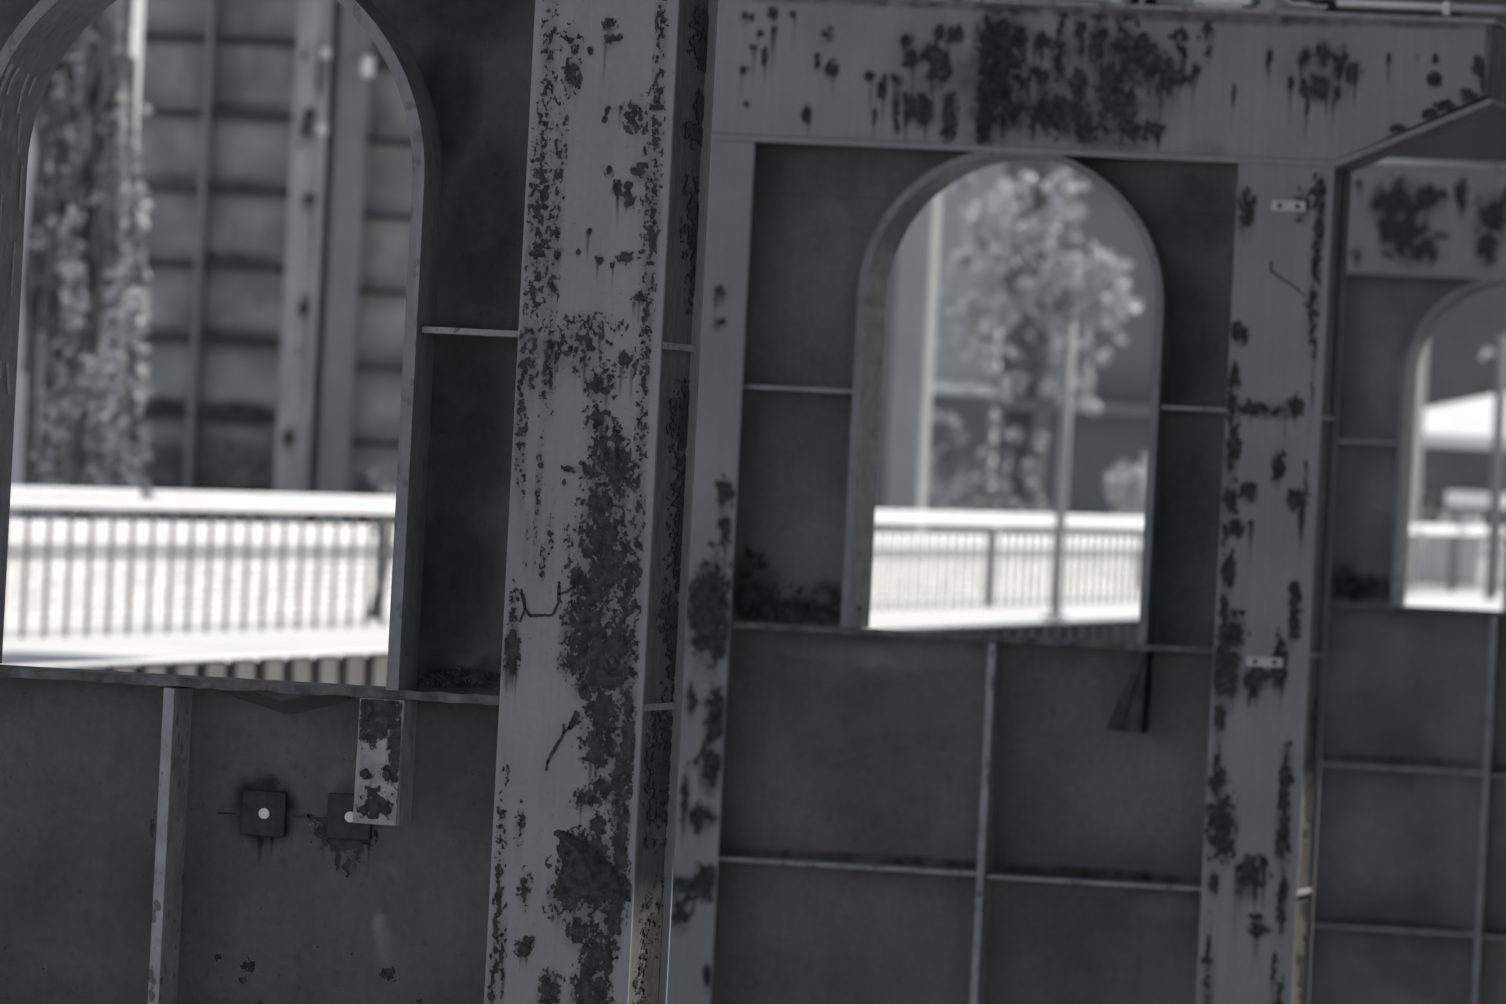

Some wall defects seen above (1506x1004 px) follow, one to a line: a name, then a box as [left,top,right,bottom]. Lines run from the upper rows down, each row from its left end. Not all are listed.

corrosion [739,7,796,75]
corrosion [800,102,811,124]
corrosion [814,25,839,79]
corrosion [864,7,1216,146]
corrosion [1265,46,1273,73]
corrosion [1287,41,1364,113]
corrosion [1389,53,1484,133]
corrosion [1355,175,1506,266]
corrosion [503,0,671,677]
corrosion [1201,172,1327,1004]
corrosion [308,699,402,878]
corrosion [487,764,535,1004]